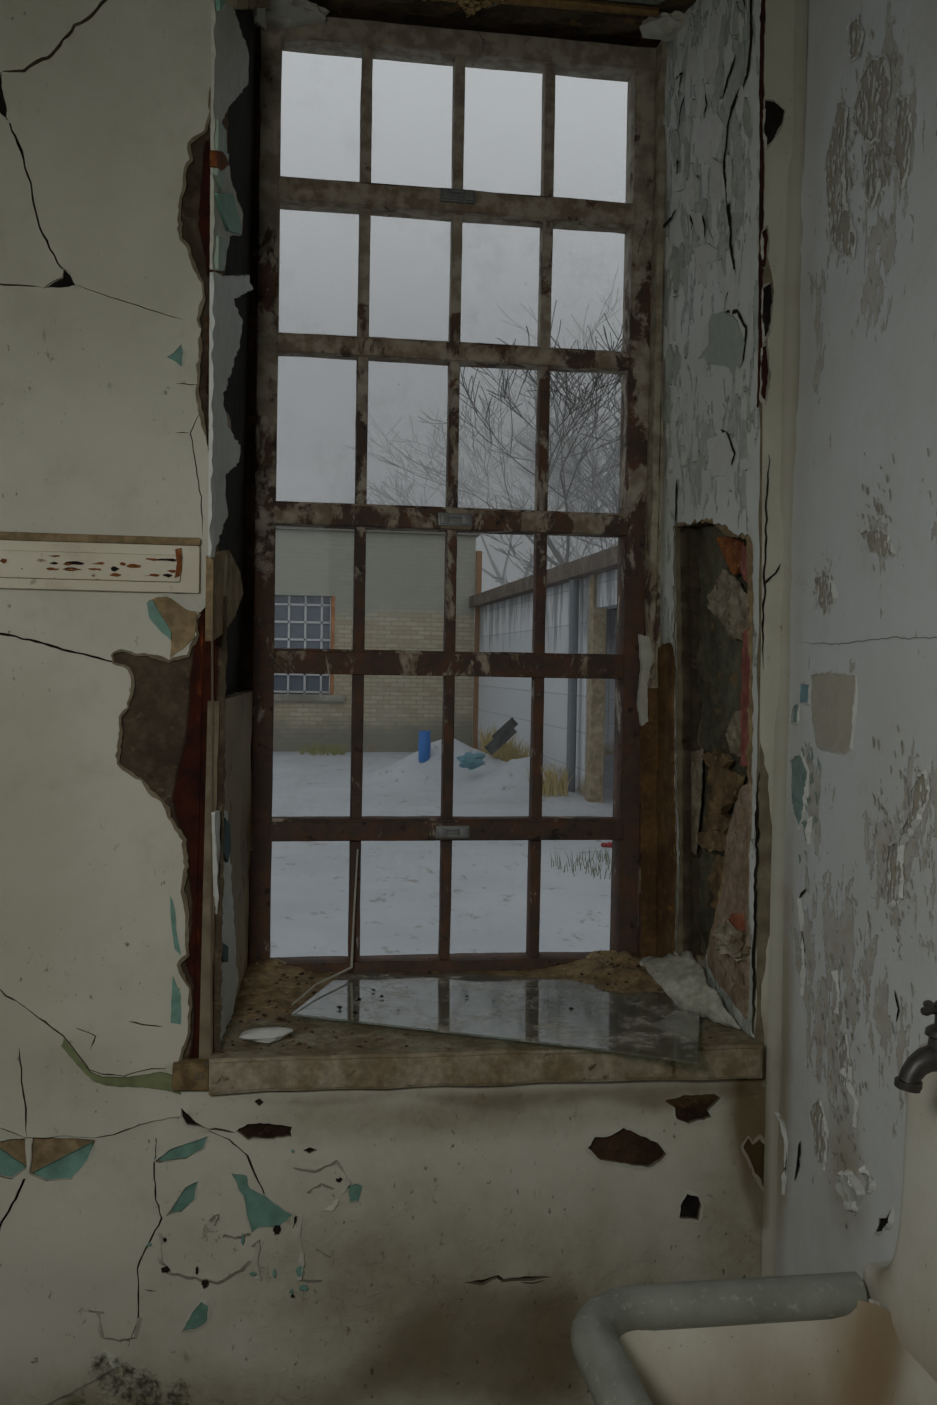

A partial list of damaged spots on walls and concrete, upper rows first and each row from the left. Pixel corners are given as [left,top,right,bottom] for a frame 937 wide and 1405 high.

crack [9,123,65,272]
peeling [824,14,913,267]
flaking render [45,0,330,1061]
flaking render [610,0,754,1019]
peeling [790,669,858,864]
crack [0,1179,26,1229]
peeling [0,1136,98,1181]
crack [61,1029,184,1114]
crack [129,1141,162,1342]
peeling [146,1173,335,1333]
flaking render [237,1098,363,1211]
flaking render [584,1124,669,1171]